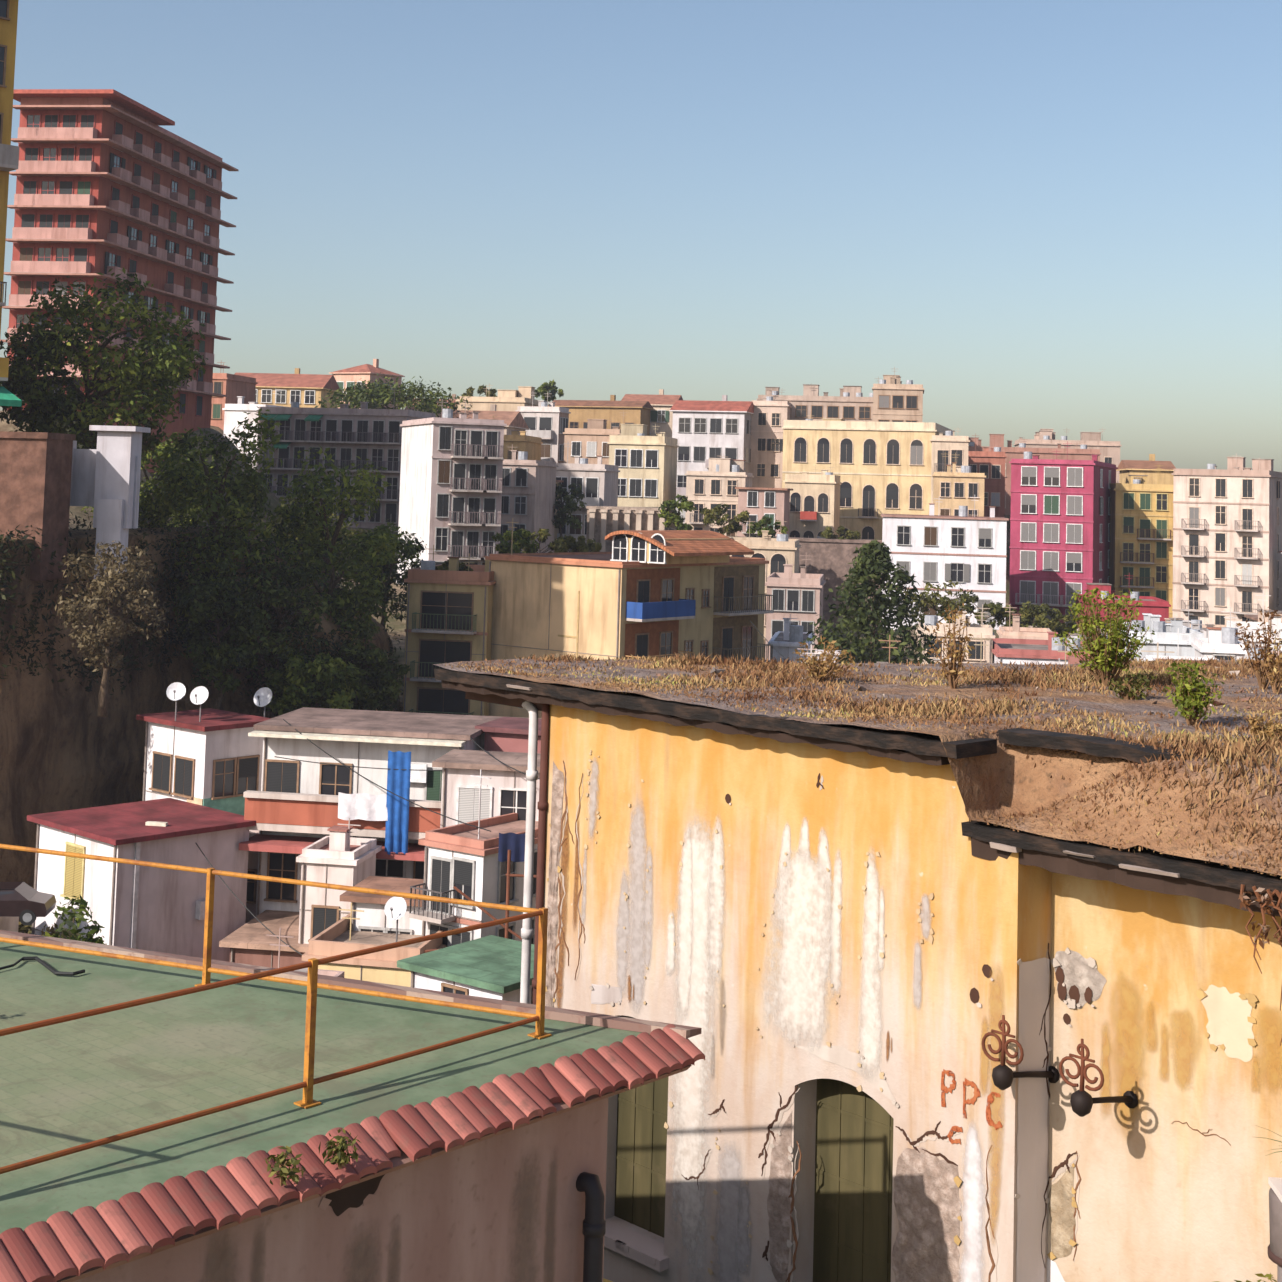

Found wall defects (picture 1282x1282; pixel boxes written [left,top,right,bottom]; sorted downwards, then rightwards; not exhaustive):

damp [582,750,600,921]
crack [1039,943,1052,1100]
spalling [1051,947,1106,1027]
peeling [1196,985,1258,1062]
crack [758,1085,802,1282]
spalling [767,1111,793,1282]
spalling [891,1147,962,1282]
crack [895,1121,998,1282]
crack [1041,1151,1081,1269]